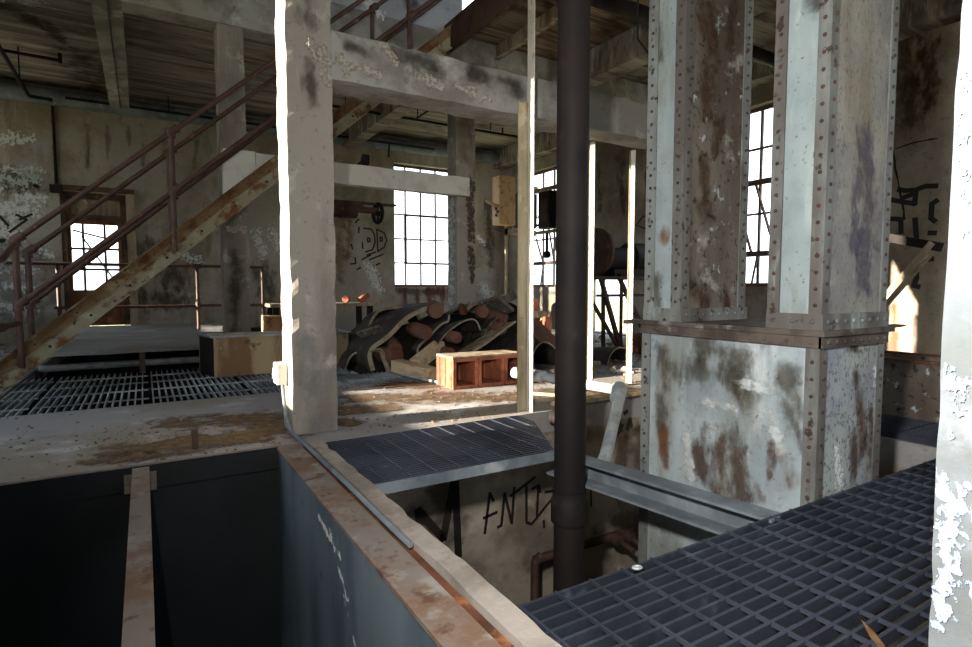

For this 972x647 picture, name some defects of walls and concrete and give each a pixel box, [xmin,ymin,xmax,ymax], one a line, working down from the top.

water stain [0,0,105,93]
water stain [307,72,316,98]
water stain [393,51,437,72]
water stain [895,35,940,129]
spalling [586,422,608,458]
rust [660,427,668,468]
rust [692,430,752,503]
rust [777,365,800,439]
rust [851,399,873,480]
spalling [385,461,554,606]
spalling [584,488,639,582]
peeling [873,467,972,647]